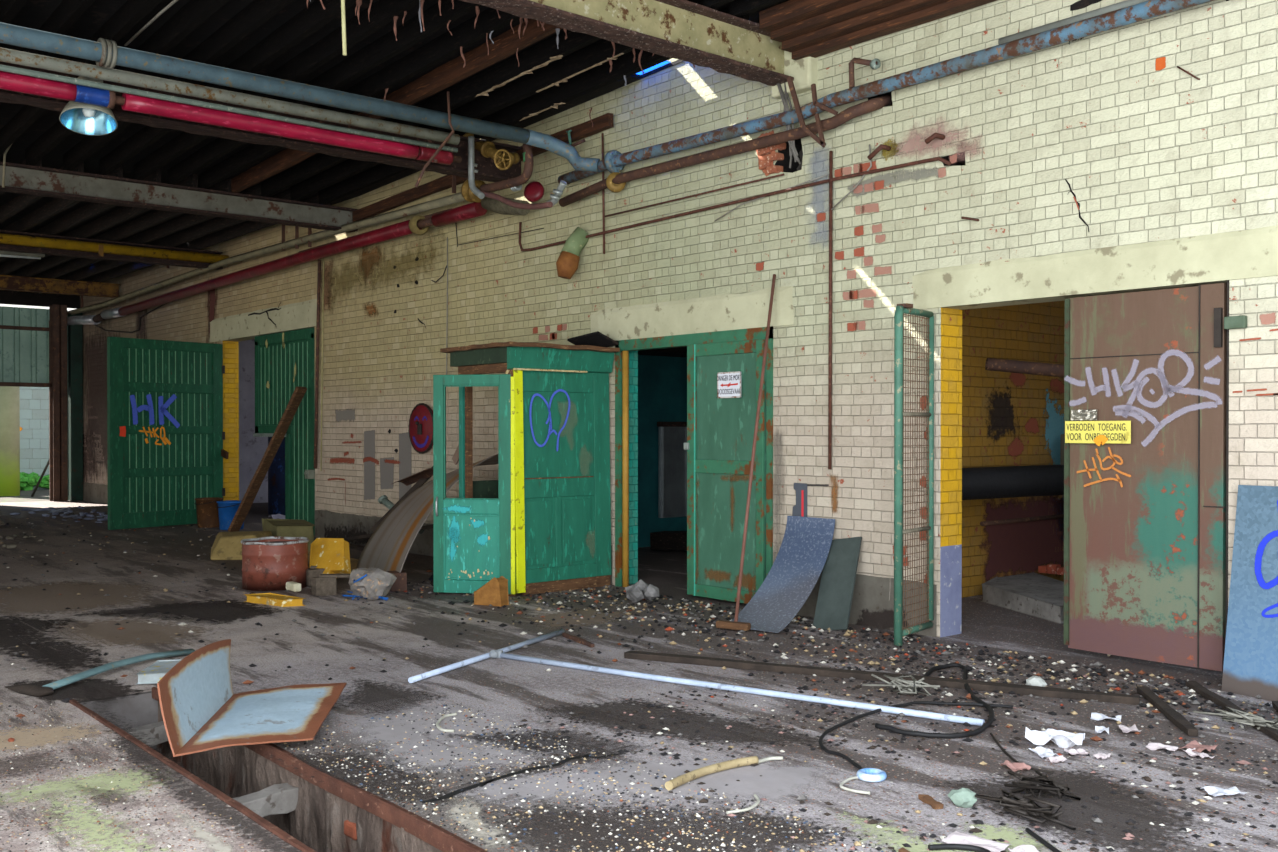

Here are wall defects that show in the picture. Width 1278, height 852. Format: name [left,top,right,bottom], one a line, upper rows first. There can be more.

spalling [756,130,786,176]
crack [1065,179,1089,232]
damp [329,245,436,301]
peeling [834,160,892,331]
rust [717,371,741,398]
damp [0,581,223,648]
peeling [388,581,1275,774]